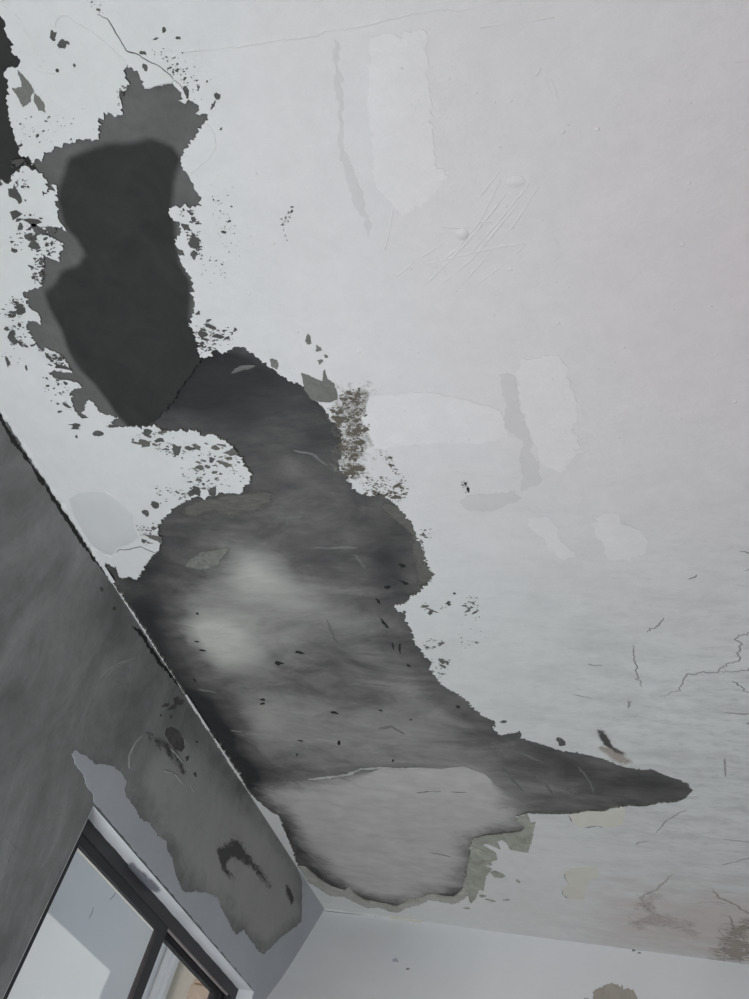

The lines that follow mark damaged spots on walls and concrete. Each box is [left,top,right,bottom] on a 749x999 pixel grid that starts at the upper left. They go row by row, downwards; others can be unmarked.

peeling [0,16,233,428]
peeling [305,334,328,365]
leakage [330,388,409,502]
flaking render [0,347,692,999]
crack [627,618,749,725]
leakage [128,733,193,791]
leakage [598,731,623,754]
leakage [127,863,159,892]
leakage [218,840,266,881]